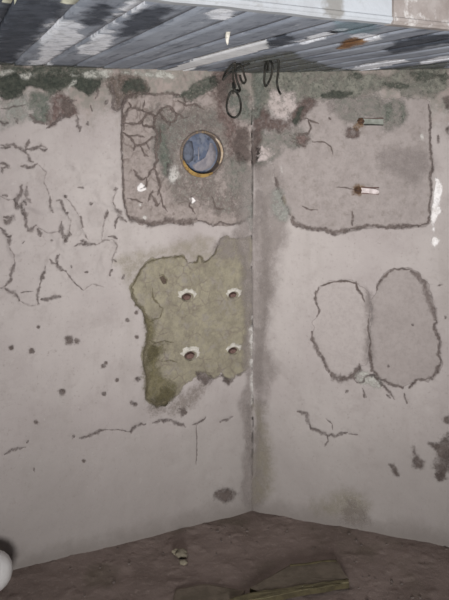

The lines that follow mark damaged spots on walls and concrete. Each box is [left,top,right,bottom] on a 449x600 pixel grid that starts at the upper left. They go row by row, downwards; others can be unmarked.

corrosion [336,37,366,49]
crack [0,82,203,212]
crack [0,185,127,303]
flaking render [129,236,253,407]
leakage [150,28,449,503]
crack [73,417,206,461]
crack [297,411,358,446]